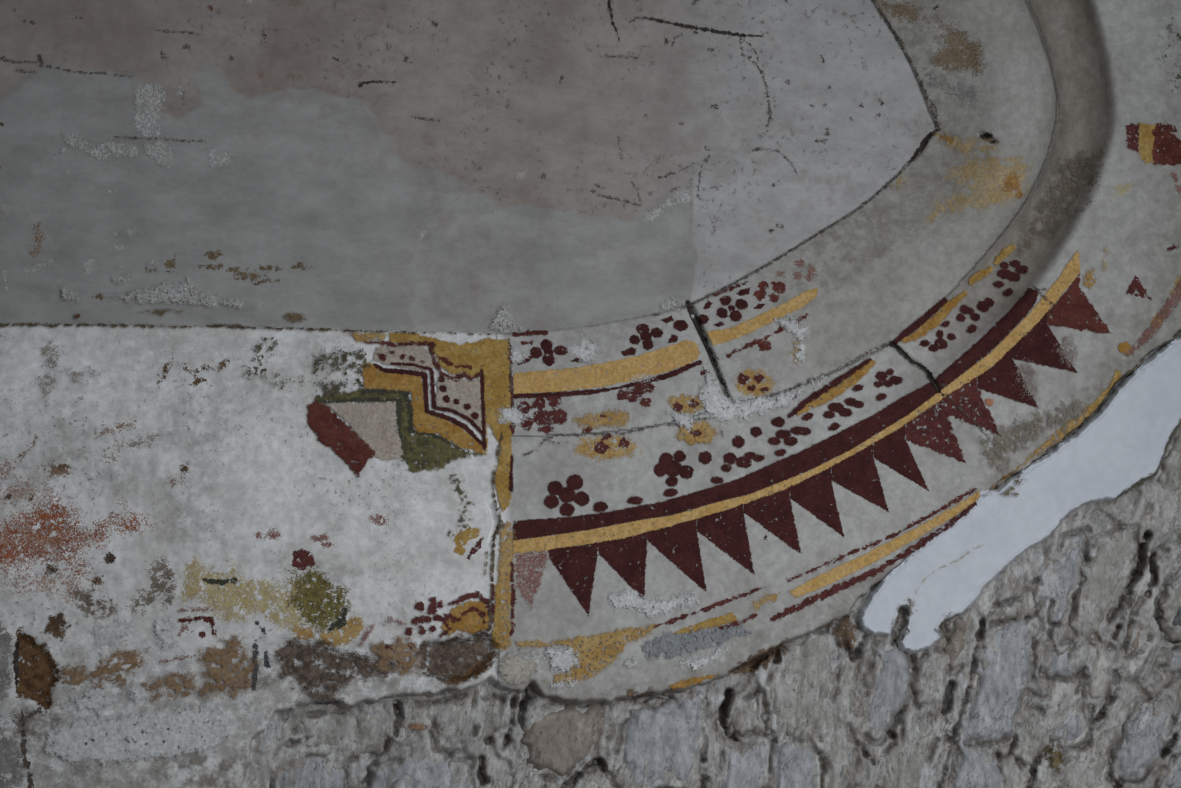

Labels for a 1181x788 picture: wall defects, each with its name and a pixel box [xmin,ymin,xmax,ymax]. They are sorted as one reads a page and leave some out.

flaking render [1115,420,1181,504]
flaking render [607,590,703,619]
flaking render [828,615,859,651]
flaking render [890,599,919,641]
flaking render [935,613,959,639]
flaking render [275,626,588,712]
flaking render [677,638,791,677]
flaking render [621,687,653,702]